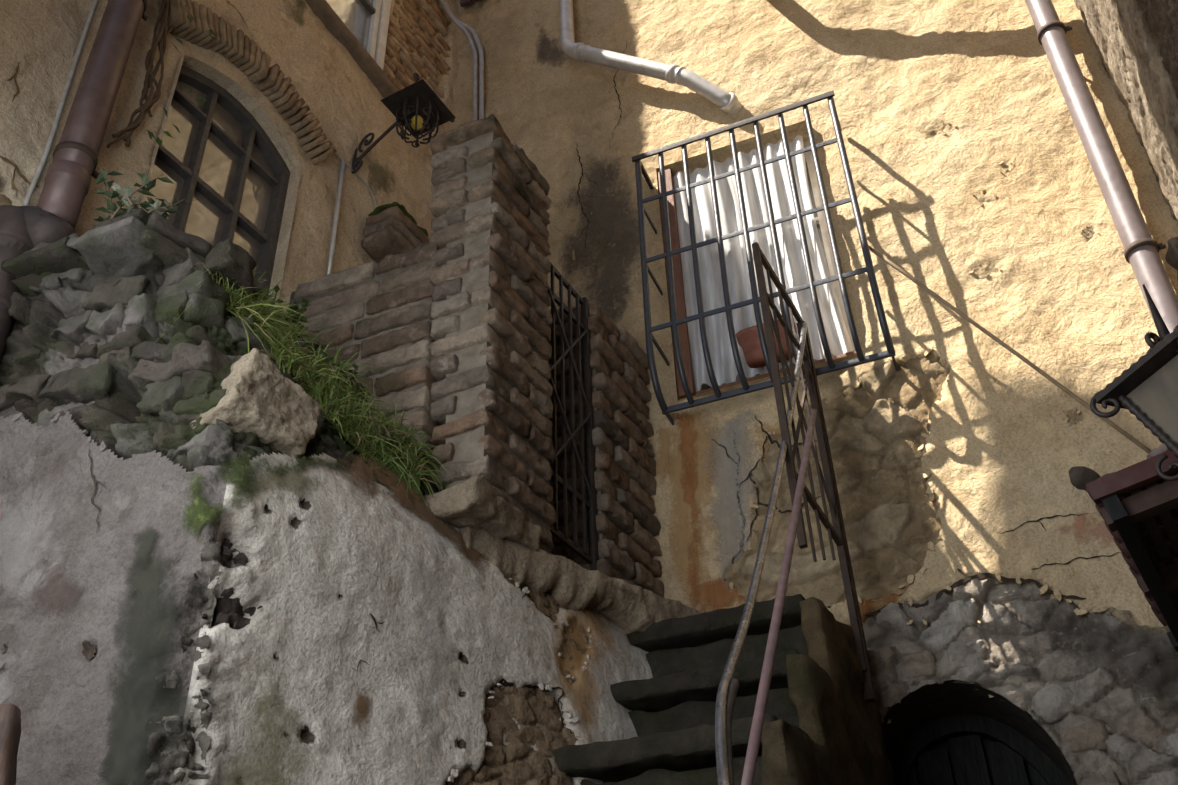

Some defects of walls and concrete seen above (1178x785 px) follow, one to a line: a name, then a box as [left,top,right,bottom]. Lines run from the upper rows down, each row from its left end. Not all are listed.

leakage [538,31,564,62]
crack [576,145,597,245]
leakage [564,163,640,319]
leakage [135,528,158,567]
rust [656,412,746,610]
crack [711,415,821,587]
spalling [723,347,1178,785]
crack [998,513,1089,534]
spalling [145,535,263,785]
spalling [504,575,593,683]
leakage [101,667,162,785]
spalling [445,683,579,785]